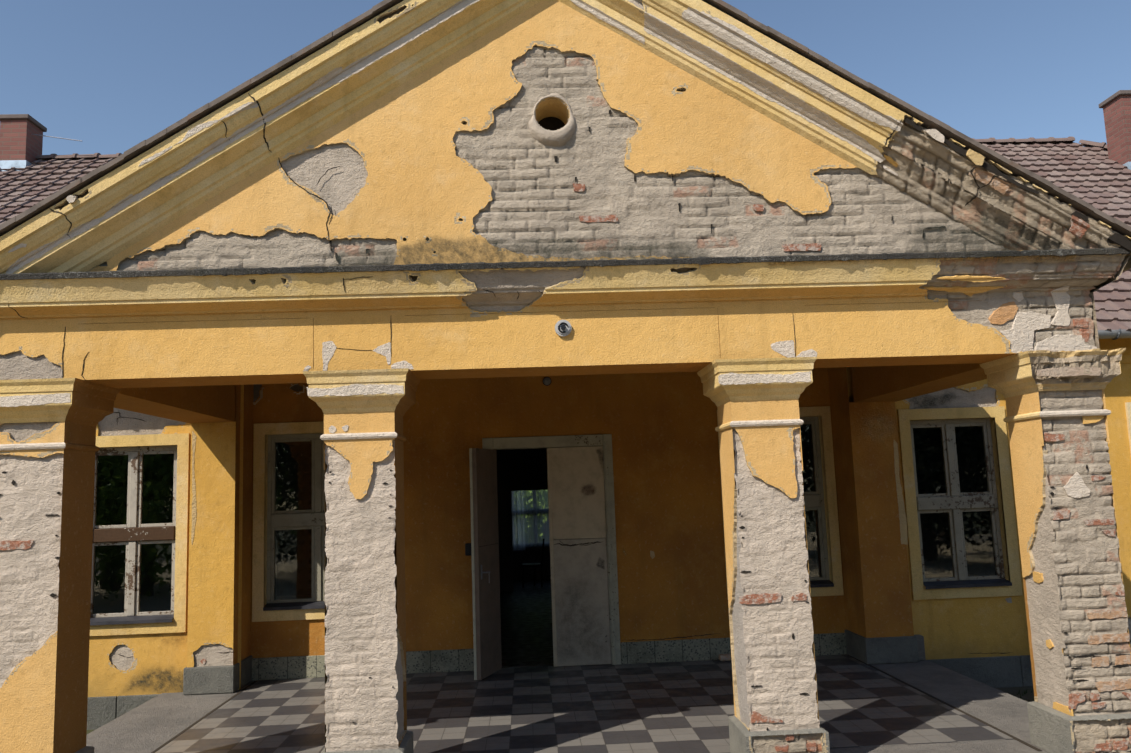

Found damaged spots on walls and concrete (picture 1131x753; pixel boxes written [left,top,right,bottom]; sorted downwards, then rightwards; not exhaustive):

peeling [6,0,479,281]
crack [248,93,340,245]
peeling [453,0,1131,354]
crack [965,167,995,206]
peeling [0,422,64,688]
peeling [98,408,197,544]
peeling [193,644,235,667]
peeling [290,384,404,397]
peeling [324,425,404,752]
peeling [718,371,811,385]
peeling [732,428,822,753]
peeling [1025,389,1131,753]